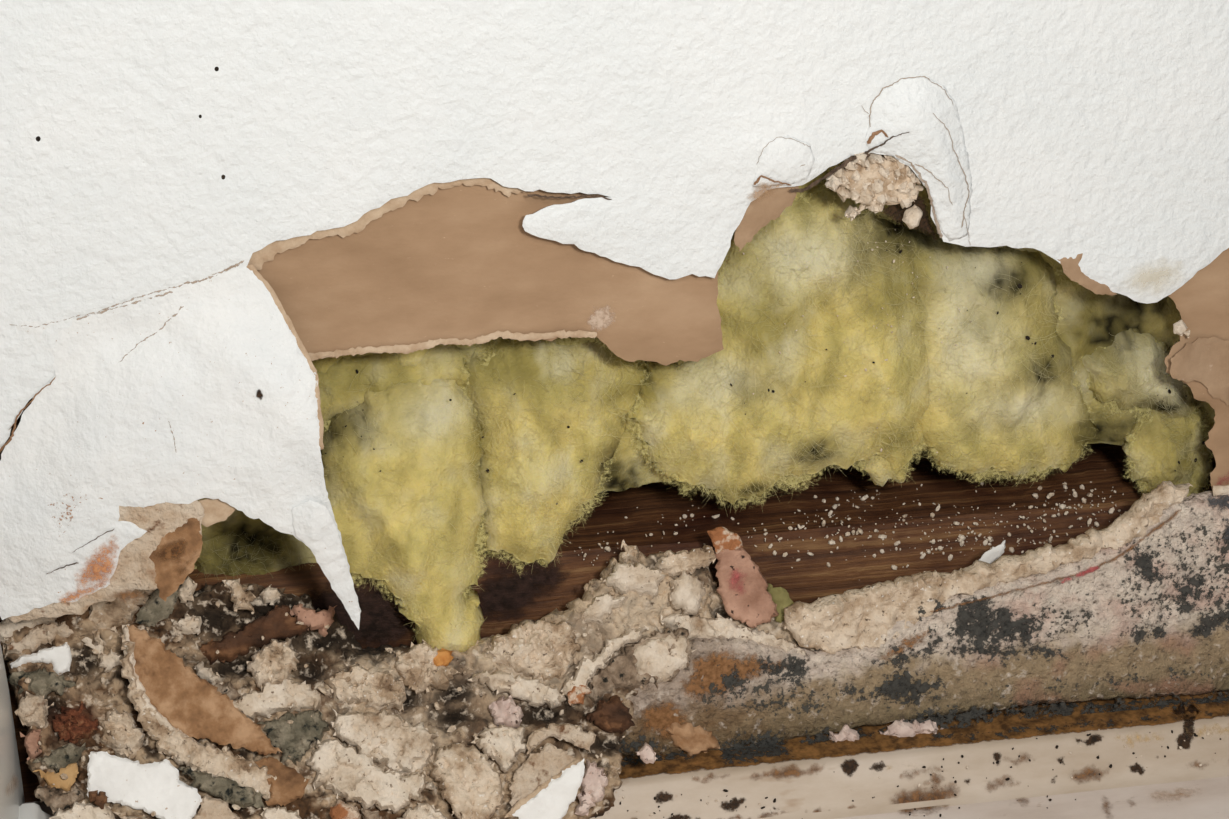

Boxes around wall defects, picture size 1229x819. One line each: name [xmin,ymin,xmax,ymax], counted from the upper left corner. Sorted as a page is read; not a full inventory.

spalling [825,152,936,240]
crack [10,261,244,362]
crack [0,376,56,452]
peeling [0,264,361,629]
spalling [783,480,1192,654]
peeling [10,642,72,675]
water stain [618,495,1229,783]
peeling [87,751,202,819]
water stain [656,792,673,803]
water stain [721,797,745,819]